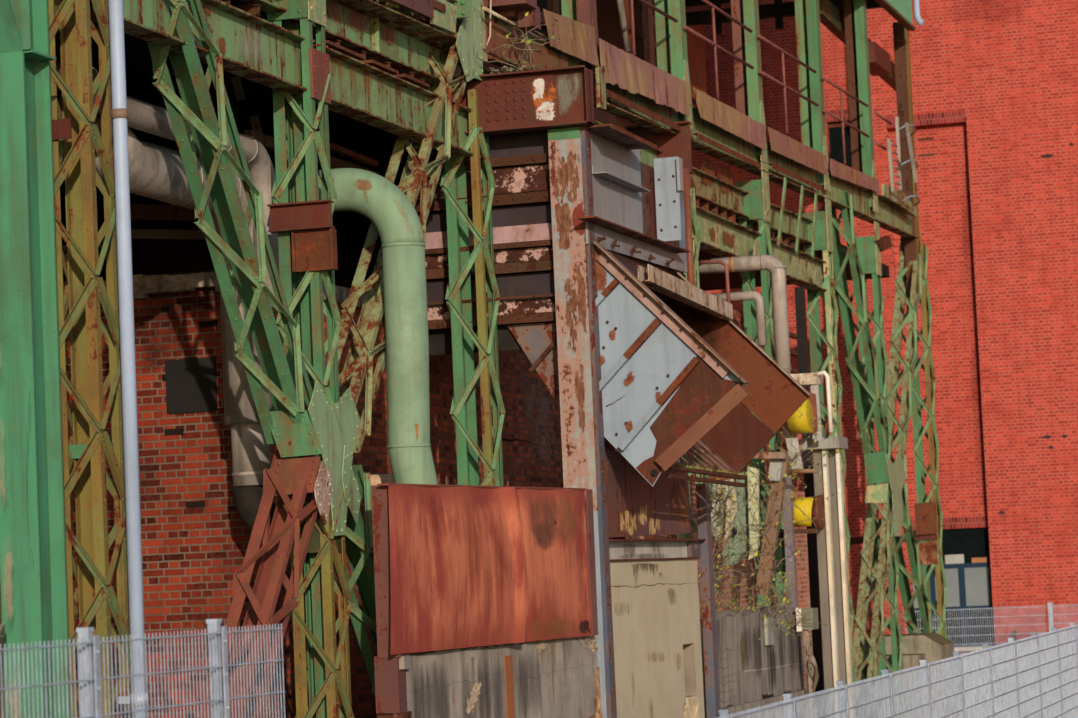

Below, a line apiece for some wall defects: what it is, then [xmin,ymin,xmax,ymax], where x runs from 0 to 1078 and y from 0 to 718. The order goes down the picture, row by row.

rust [328,0,368,35]
peeling [531,78,556,120]
water stain [468,670,500,718]